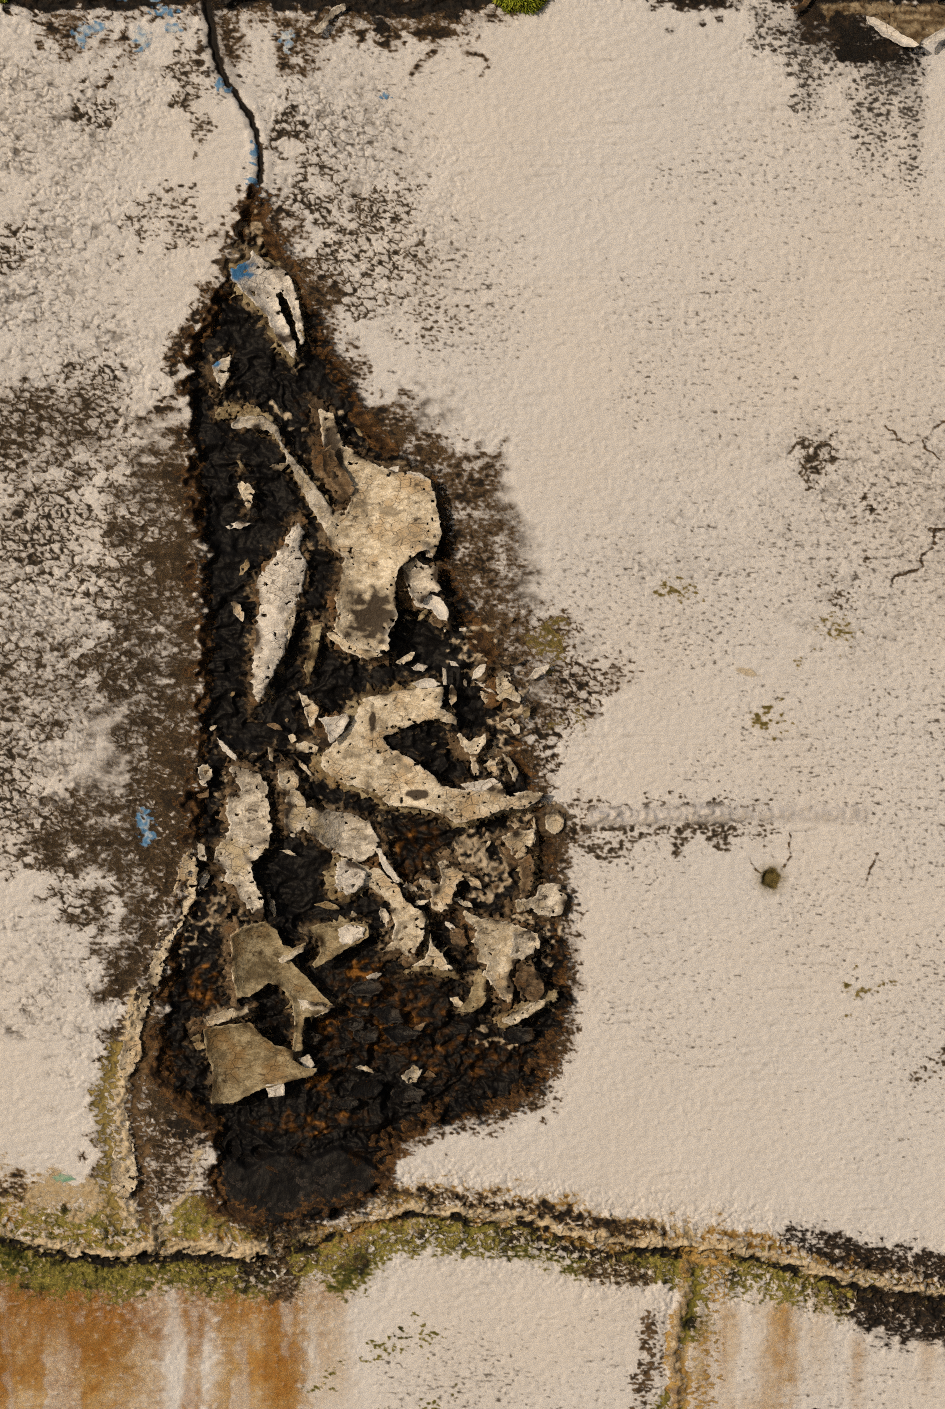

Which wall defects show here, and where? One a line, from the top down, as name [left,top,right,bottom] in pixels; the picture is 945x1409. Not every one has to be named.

water stain [35,3,141,132]
water stain [160,3,217,159]
crack [0,0,550,233]
water stain [651,0,928,196]
crack [813,0,945,8]
water stain [214,0,780,890]
water stain [0,276,250,1231]
peeling [136,807,157,847]
peeling [143,140,580,1242]
crack [0,848,945,1409]
corrosion [0,1276,156,1409]
corrosion [178,1285,300,1409]